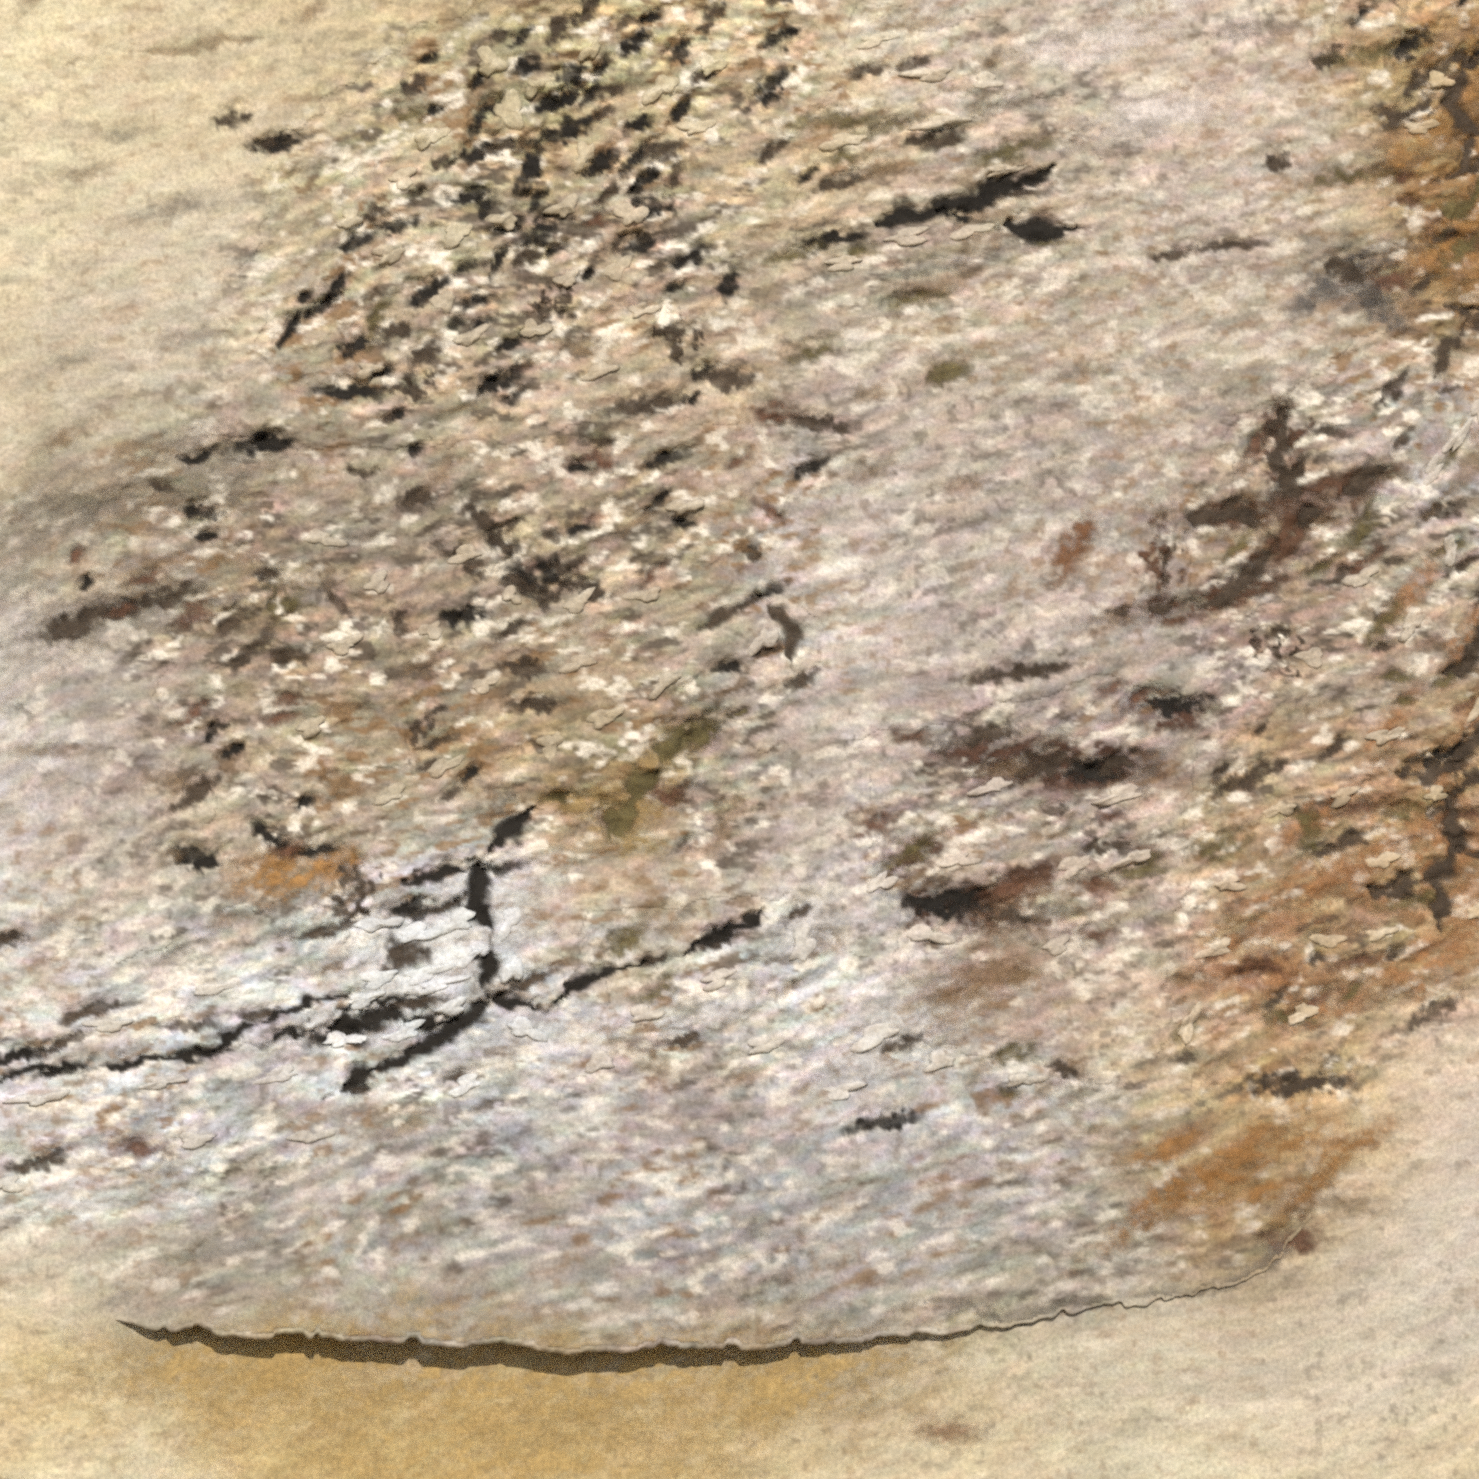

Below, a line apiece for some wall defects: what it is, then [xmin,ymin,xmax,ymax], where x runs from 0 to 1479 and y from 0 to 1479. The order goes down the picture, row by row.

crack [1372,49,1479,219]
crack [604,709,747,838]
corrosion [1284,854,1364,907]
corrosion [1408,811,1479,904]
crack [105,792,645,1092]
crack [684,910,762,955]
corrosion [1217,932,1301,992]
crack [0,1063,68,1083]
corrosion [1134,1125,1303,1225]
corrosion [1293,1131,1374,1205]